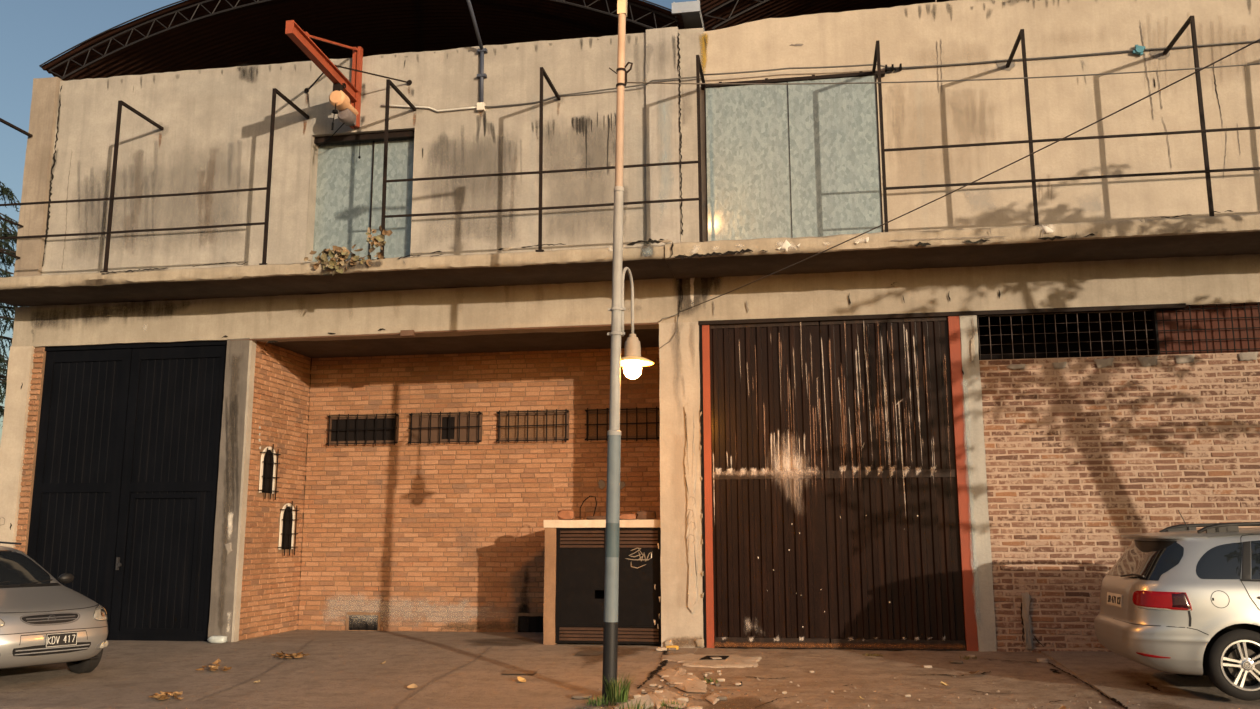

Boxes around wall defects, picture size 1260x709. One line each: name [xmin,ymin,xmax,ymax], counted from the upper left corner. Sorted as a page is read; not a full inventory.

water stain [572,112,616,173]